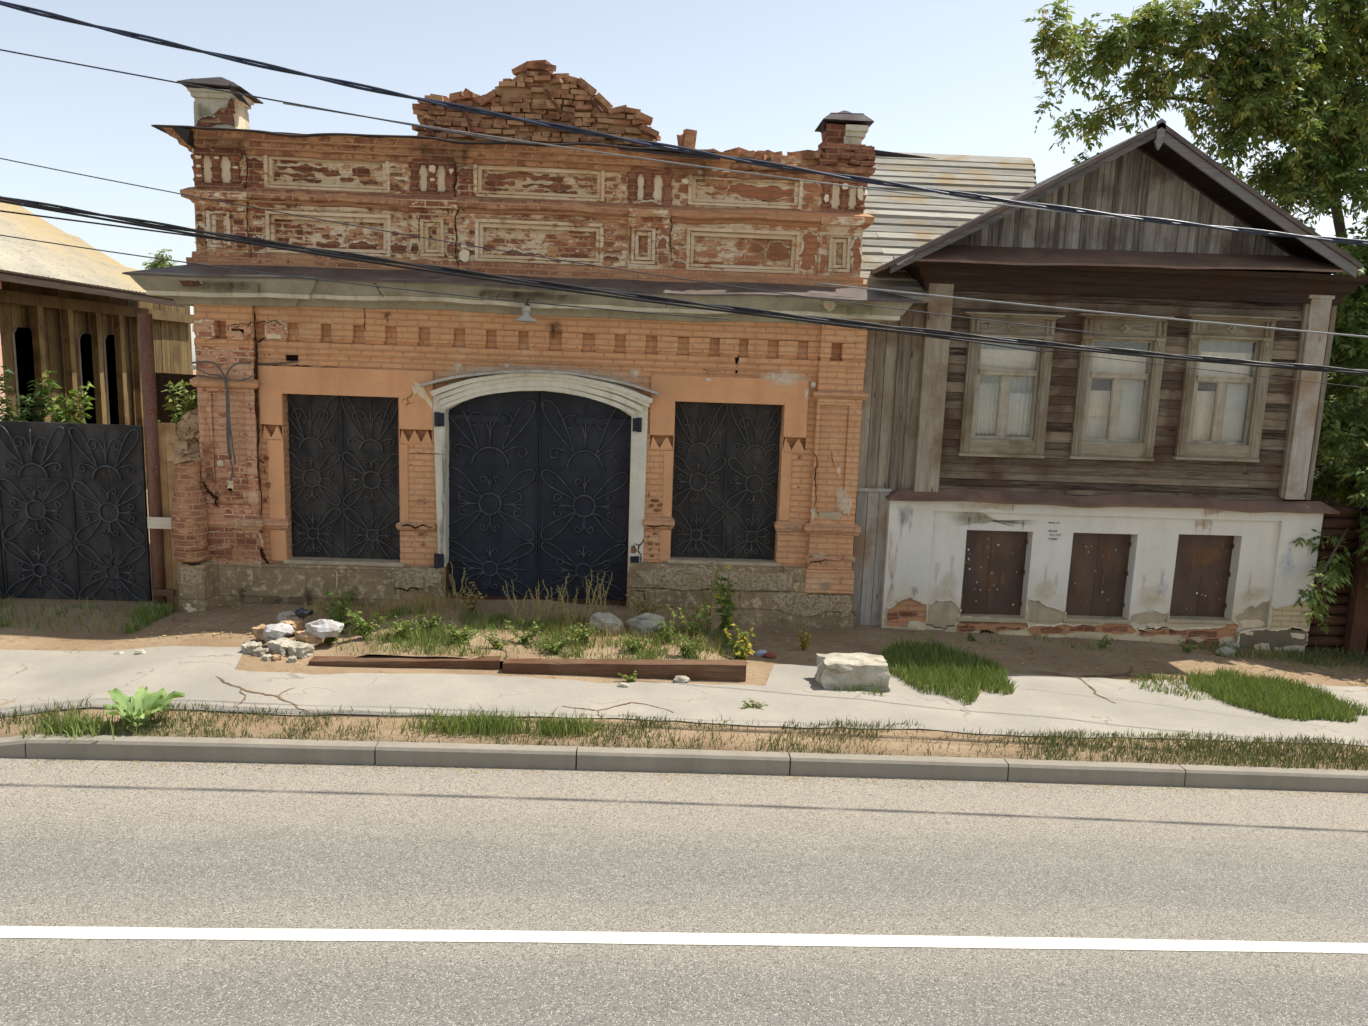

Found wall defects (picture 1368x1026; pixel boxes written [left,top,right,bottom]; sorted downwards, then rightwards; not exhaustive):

peeling [430,166,829,209]
peeling [447,227,632,261]
peeling [655,227,828,272]
peeling [850,236,864,270]
spalling [884,595,1311,652]